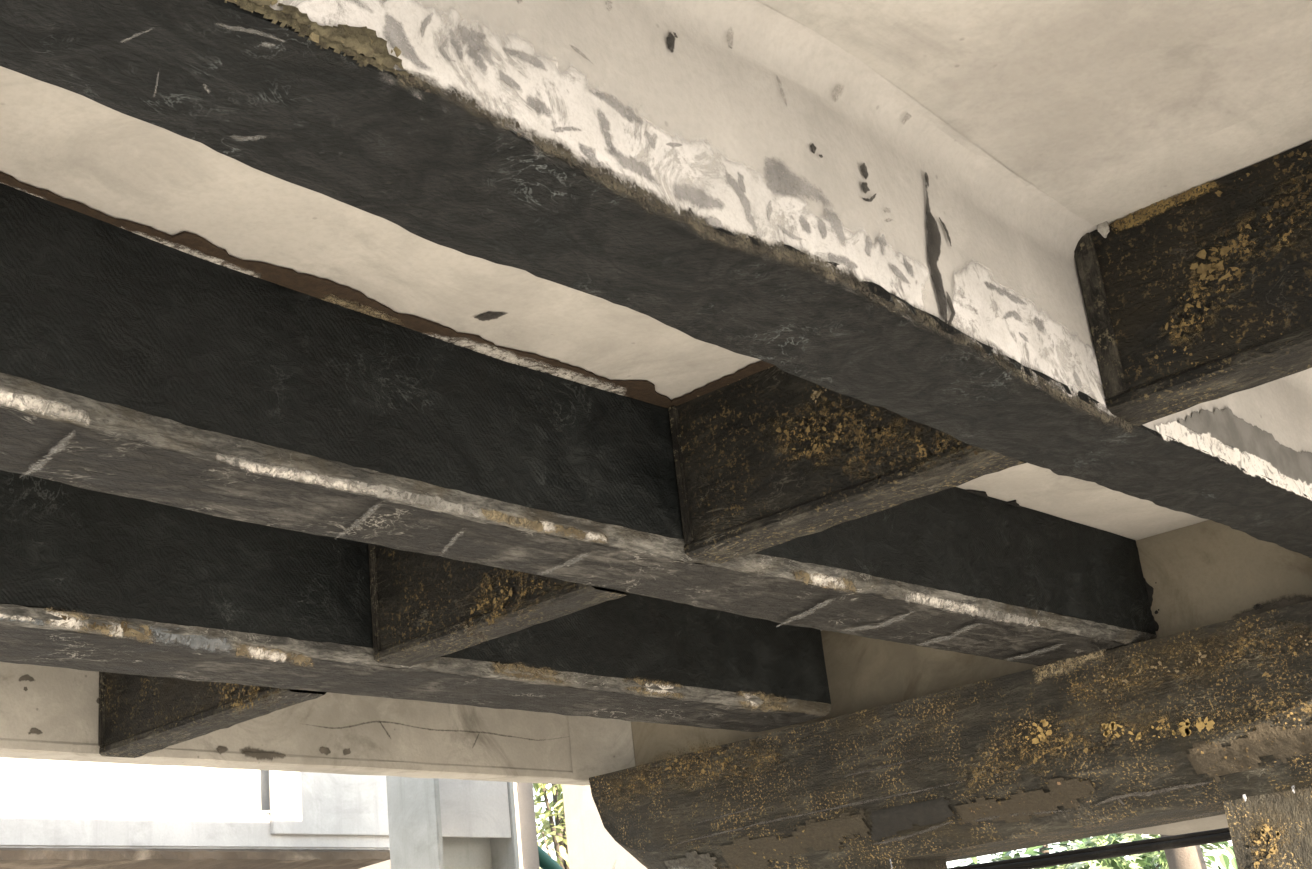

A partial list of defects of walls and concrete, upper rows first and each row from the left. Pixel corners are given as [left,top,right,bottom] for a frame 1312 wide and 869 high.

peeling [225,0,1133,434]
peeling [0,171,775,409]
peeling [0,390,90,422]
peeling [1156,407,1312,501]
peeling [216,454,607,567]
peeling [1144,578,1159,631]
water stain [1233,595,1312,619]